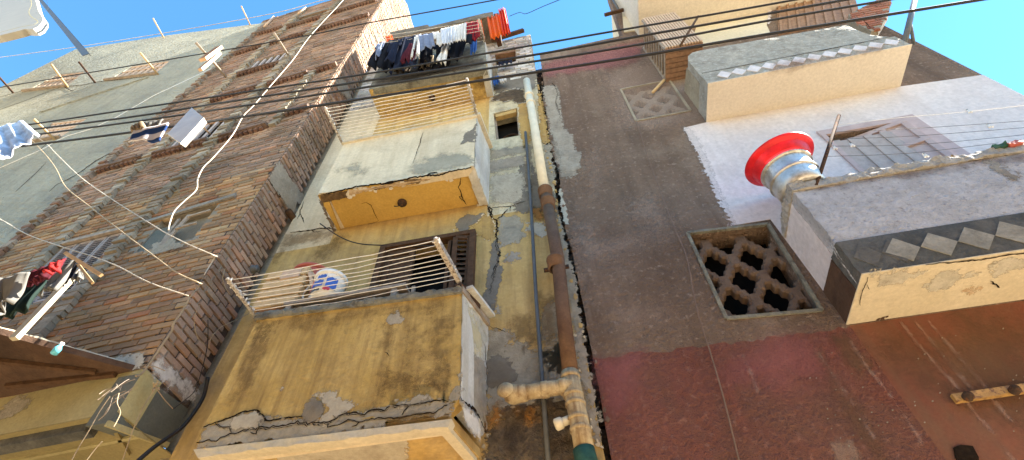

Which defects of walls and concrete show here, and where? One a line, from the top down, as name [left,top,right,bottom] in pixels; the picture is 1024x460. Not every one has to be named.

spalling [318,176,431,232]
crack [268,138,524,293]
spalling [453,74,604,448]
peeling [870,267,983,295]
crack [196,398,486,443]
spalling [193,299,574,460]